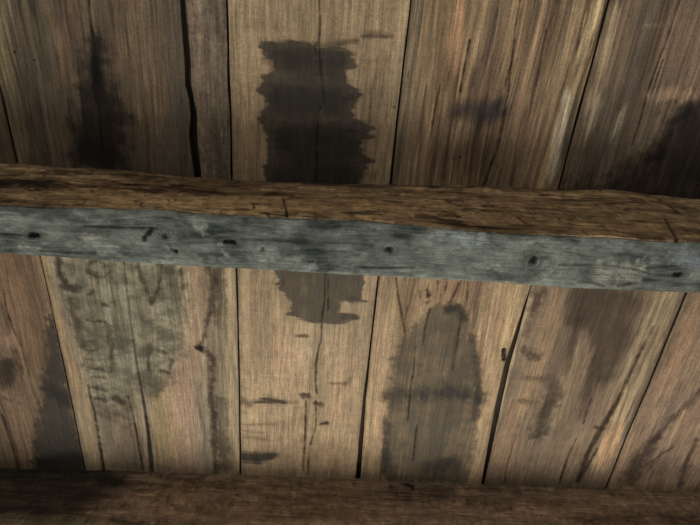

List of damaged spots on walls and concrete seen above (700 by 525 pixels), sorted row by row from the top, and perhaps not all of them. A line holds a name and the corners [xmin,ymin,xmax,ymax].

water stain [73,38,124,169]
water stain [256,40,376,184]
water stain [56,257,81,328]
water stain [275,270,367,324]
water stain [0,318,124,515]
water stain [383,306,481,483]